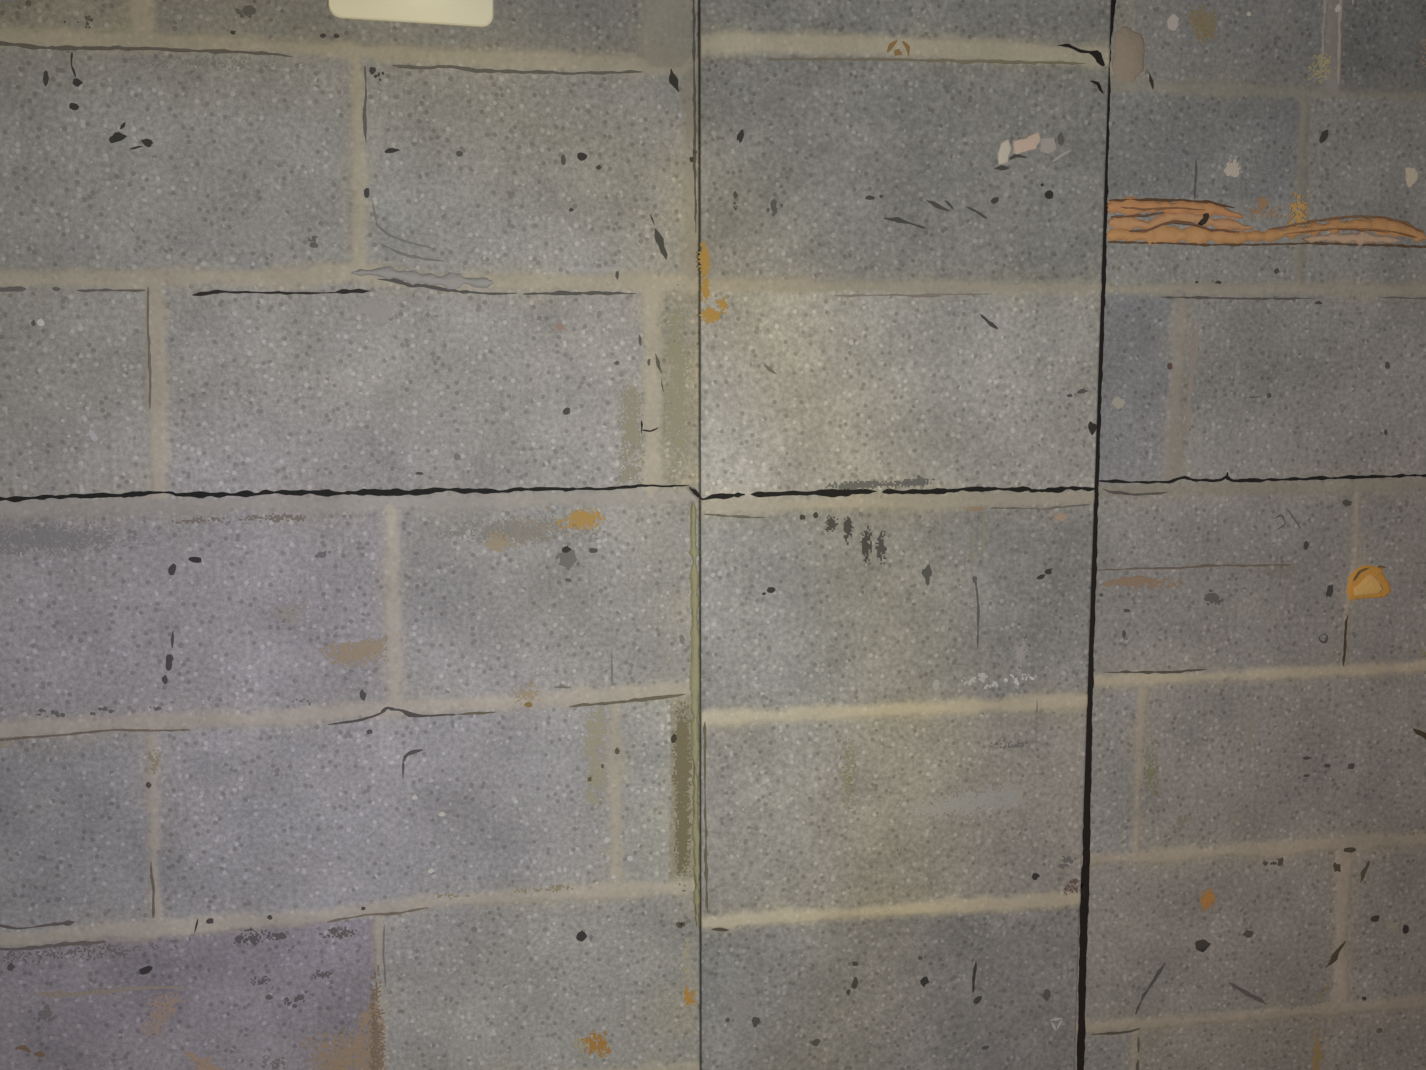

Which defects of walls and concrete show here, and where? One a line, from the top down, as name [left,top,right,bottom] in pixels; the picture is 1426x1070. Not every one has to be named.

crack [690,0,698,232]
spalling [995,132,1071,170]
crack [0,484,745,502]
crack [704,512,765,520]
crack [751,0,1426,1070]
corrosion [1346,565,1391,601]